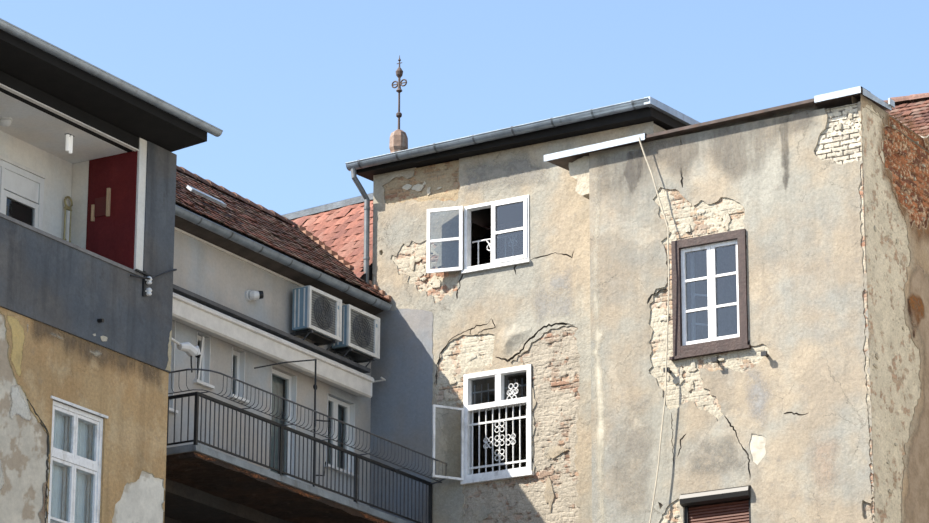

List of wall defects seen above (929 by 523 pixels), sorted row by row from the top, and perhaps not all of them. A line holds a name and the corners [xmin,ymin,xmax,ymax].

spalling [382,160,460,204]
leakage [624,141,693,184]
leakage [714,126,747,174]
crack [436,319,496,384]
crack [496,322,572,362]
spalling [648,187,770,421]
spalling [814,103,929,523]
crack [27,399,49,523]
spalling [462,325,580,523]
crack [725,417,751,477]
leakage [905,266,929,523]
peeling [112,470,165,523]